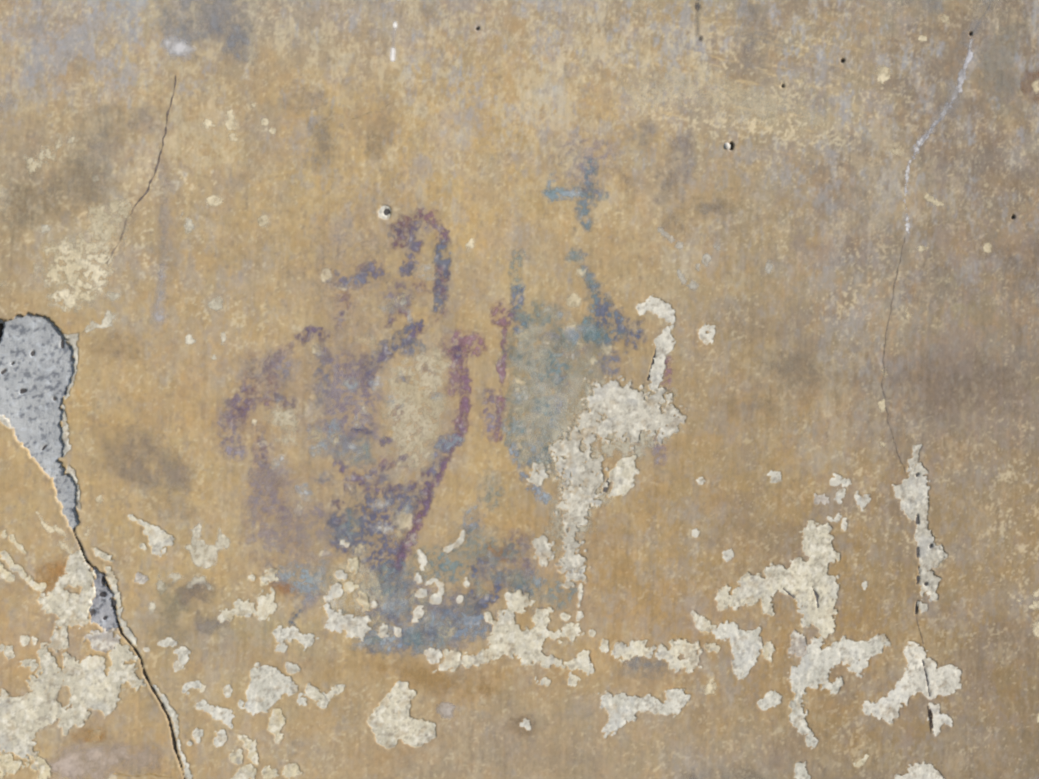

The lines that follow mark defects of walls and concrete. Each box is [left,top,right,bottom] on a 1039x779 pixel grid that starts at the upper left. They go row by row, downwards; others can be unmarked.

crack [106,75,176,263]
crack [882,1,992,472]
spalling [0,293,191,779]
crack [73,528,193,779]
peeling [128,514,230,612]
peeling [182,540,402,779]
peeling [367,681,456,749]
peeling [424,296,891,749]
peeling [862,641,961,736]
peeling [892,444,948,614]
peeling [895,761,945,779]
crack [927,708,935,733]